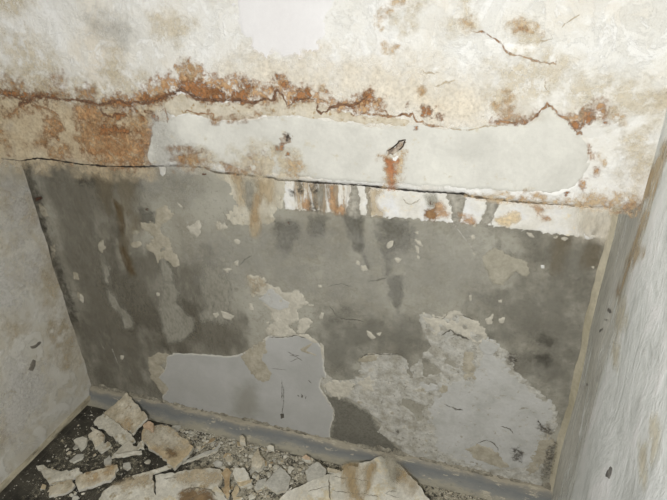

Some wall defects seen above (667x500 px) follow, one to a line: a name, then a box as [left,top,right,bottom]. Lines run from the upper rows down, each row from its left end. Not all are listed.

crack [473,30,556,65]
water stain [0,42,242,396]
corrosion [73,59,383,171]
flaking render [275,132,293,151]
crack [7,158,593,208]
corrosion [294,182,346,215]
water stain [249,57,483,125]
water stain [371,190,411,307]
flaking render [378,139,406,191]
corrosion [566,98,625,129]
peeling [241,274,324,382]
peeling [320,310,558,485]